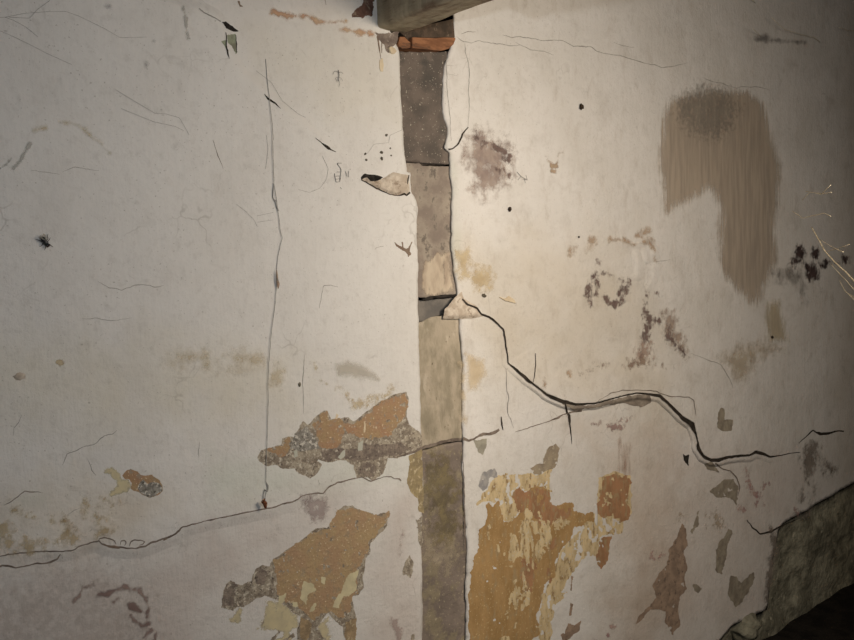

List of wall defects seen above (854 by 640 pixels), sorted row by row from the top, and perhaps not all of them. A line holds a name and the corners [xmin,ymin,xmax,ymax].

leakage [464,130,512,189]
leakage [661,92,829,301]
flaking render [105,468,163,498]
flaking render [221,505,390,640]
flaking render [257,392,424,547]
crack [0,299,844,568]
flaking render [468,444,633,640]
flaking render [636,511,702,635]
flaking render [715,529,755,607]